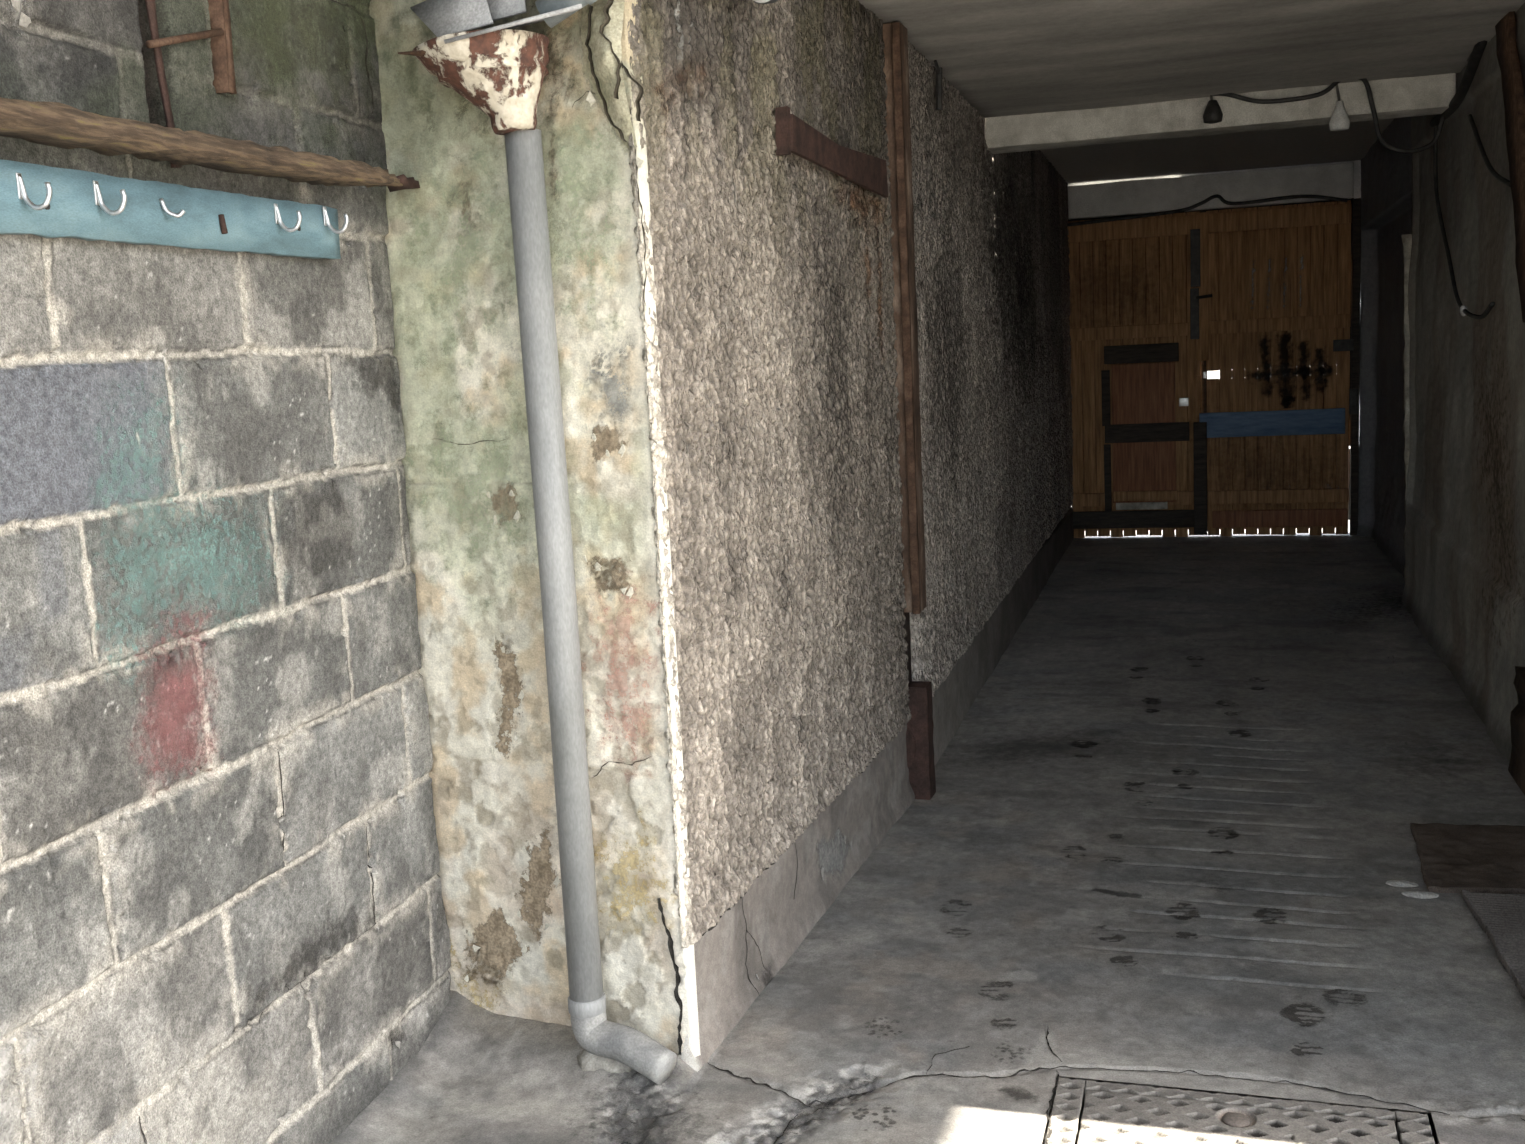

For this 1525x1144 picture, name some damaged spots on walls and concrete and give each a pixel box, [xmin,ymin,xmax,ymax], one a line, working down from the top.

spalling [485,636,524,758]
spalling [463,829,560,987]
crack [657,843,1450,1144]